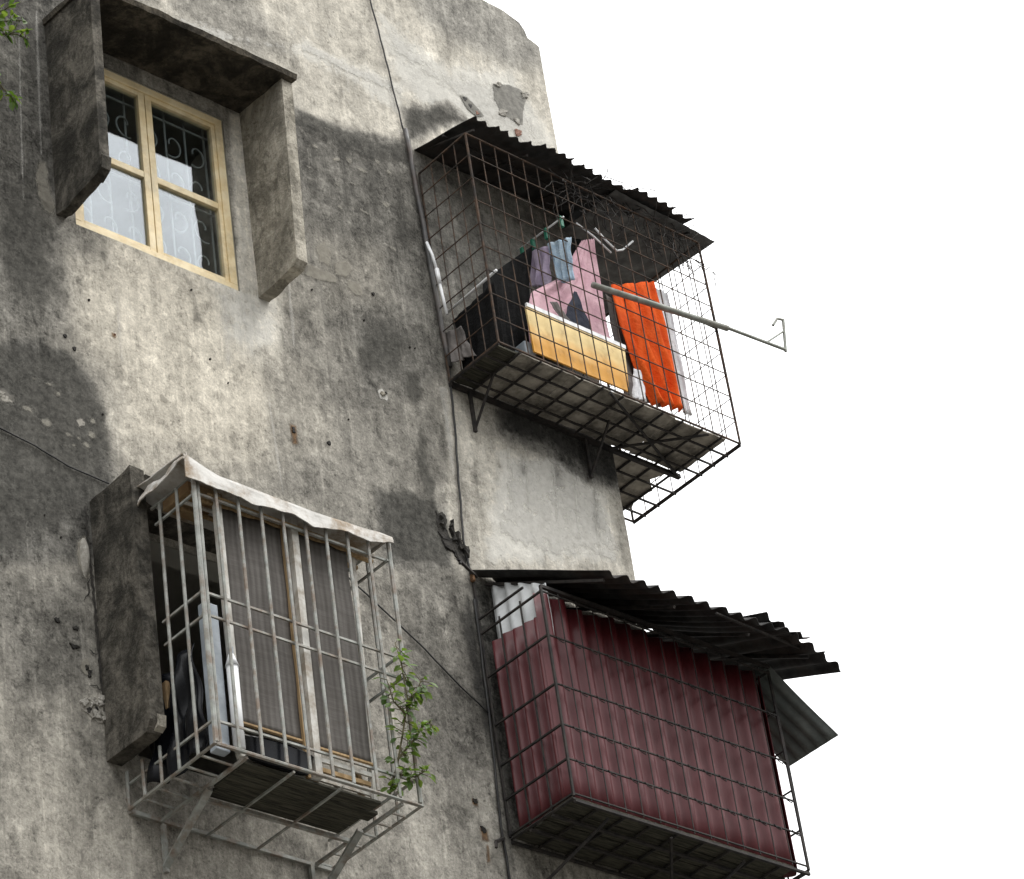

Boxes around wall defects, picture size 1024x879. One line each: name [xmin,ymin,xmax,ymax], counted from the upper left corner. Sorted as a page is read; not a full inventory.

flaking render [460,95,484,117]
flaking render [493,82,529,136]
peeling [439,512,470,558]
flaking render [69,625,93,678]
flaking render [79,693,106,723]